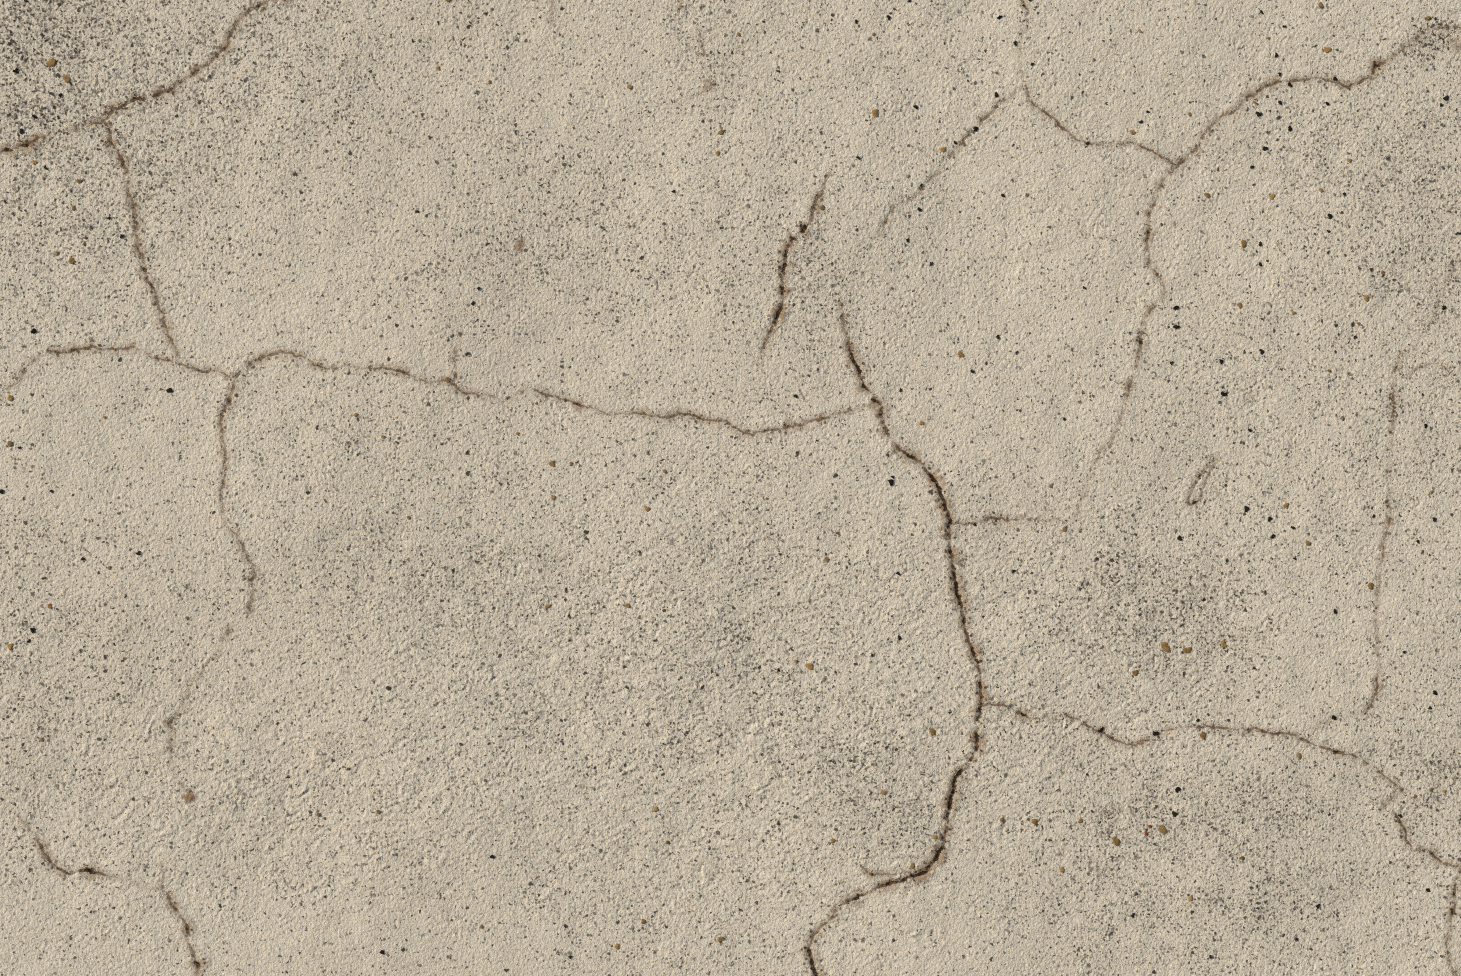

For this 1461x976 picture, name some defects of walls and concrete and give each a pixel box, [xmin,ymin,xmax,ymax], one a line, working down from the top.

crack [762,181,825,349]
crack [950,37,1419,420]
crack [0,0,326,633]
crack [368,357,478,396]
crack [535,389,591,408]
crack [1187,459,1216,506]
crack [632,314,1160,976]
crack [1366,677,1378,710]
crack [36,838,106,879]
crack [1196,725,1461,973]
crack [167,895,204,973]